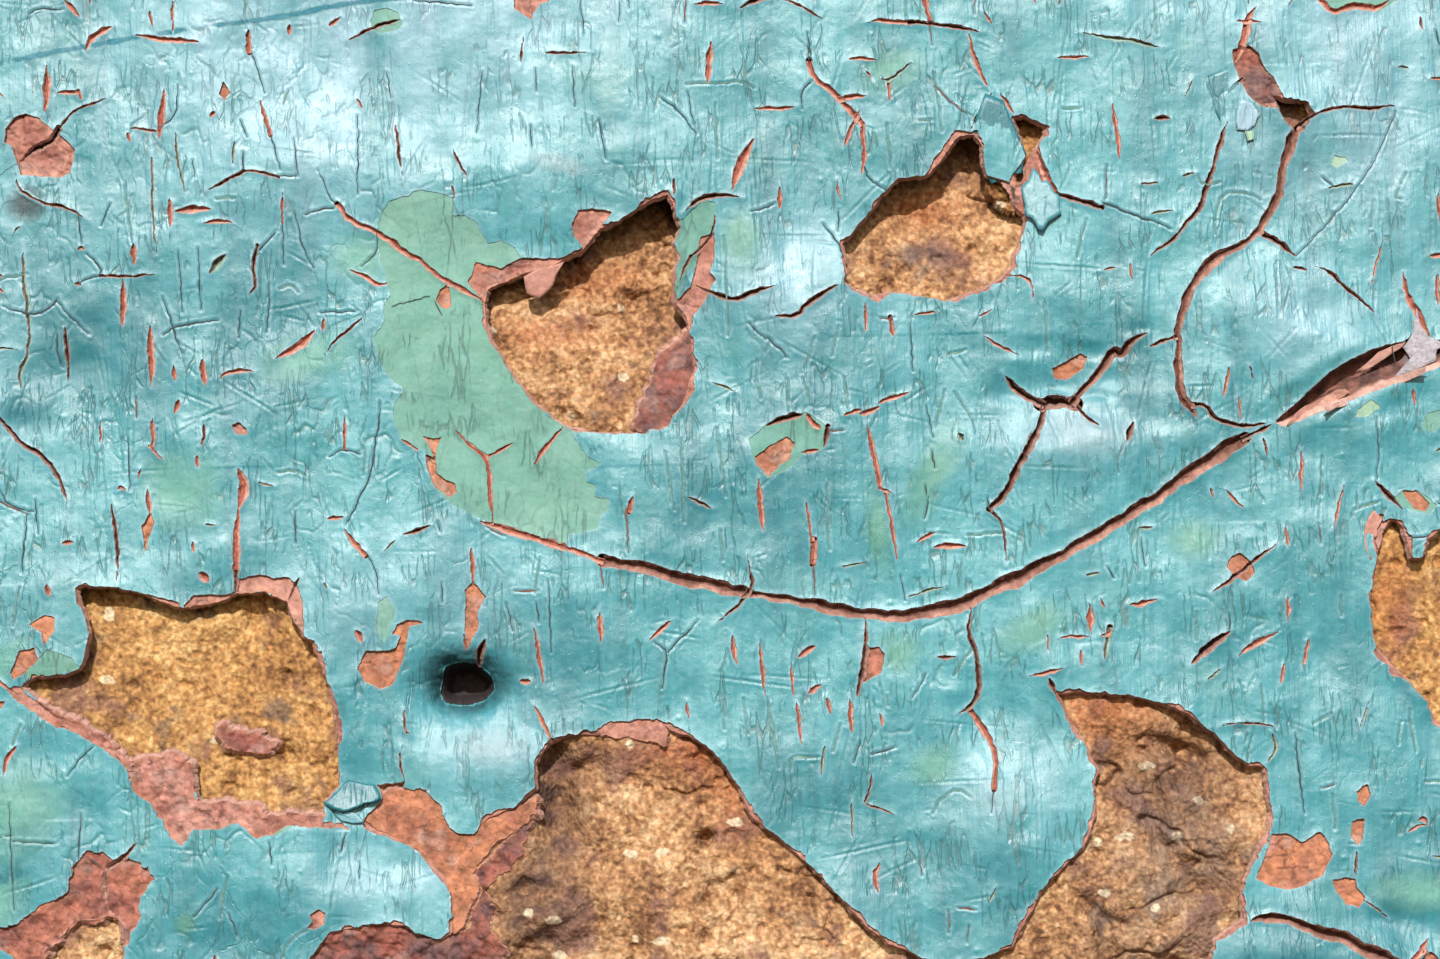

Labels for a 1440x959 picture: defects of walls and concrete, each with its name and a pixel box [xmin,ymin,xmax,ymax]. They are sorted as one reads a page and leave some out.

crack [741,0,992,190]
spalling [840,93,1061,302]
crack [1084,0,1157,47]
crack [1234,0,1258,63]
crack [1318,0,1388,14]
peeling [374,190,716,549]
peeling [749,412,833,478]
crack [457,104,1406,823]
crack [1392,275,1428,361]
spalling [1364,490,1440,727]
spalling [0,576,921,959]
spalling [983,684,1364,959]